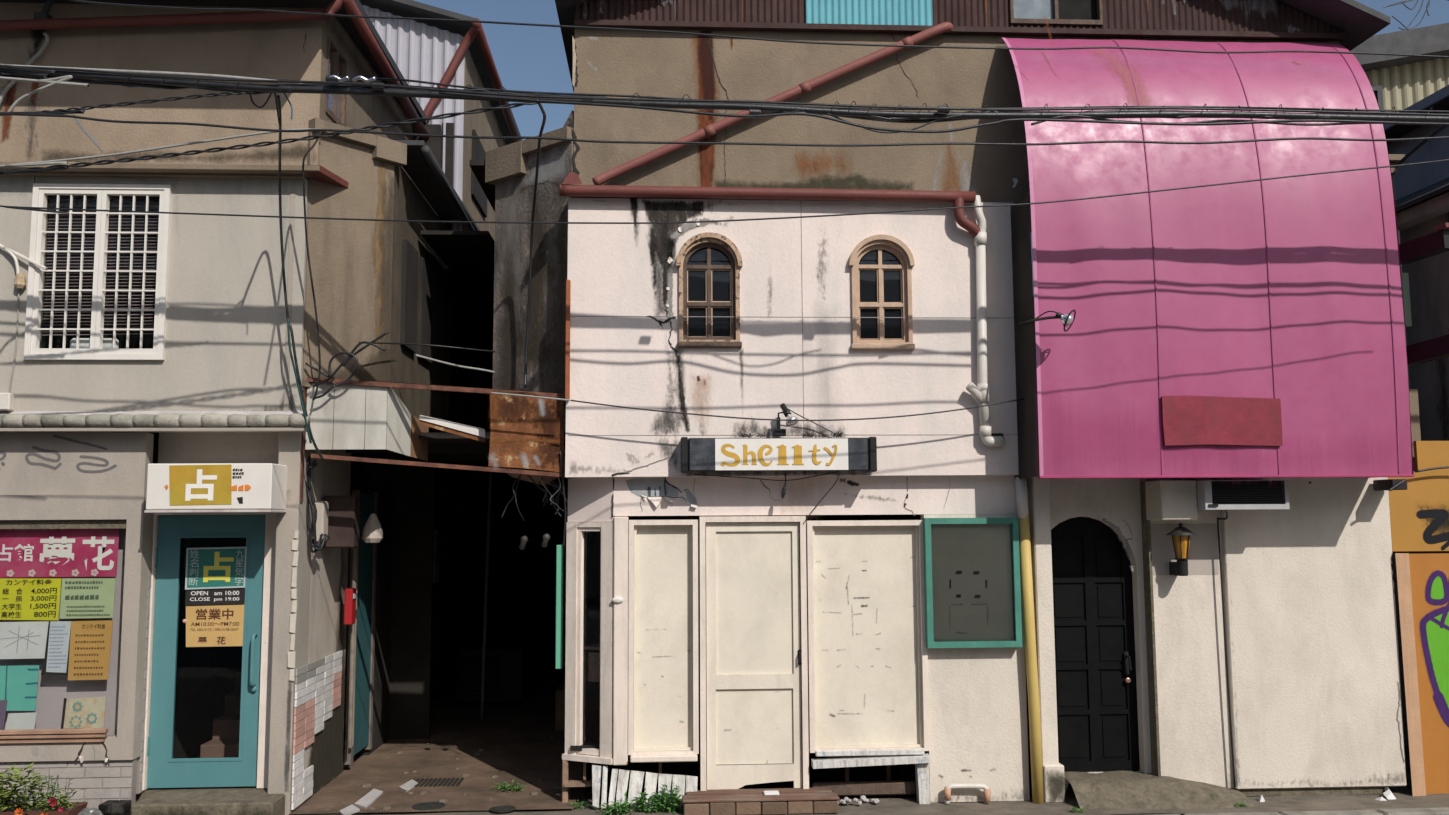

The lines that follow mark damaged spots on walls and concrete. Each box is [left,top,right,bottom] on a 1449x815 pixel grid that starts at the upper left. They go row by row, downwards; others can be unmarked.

rust [494,393,566,468]
spalling [626,478,697,508]